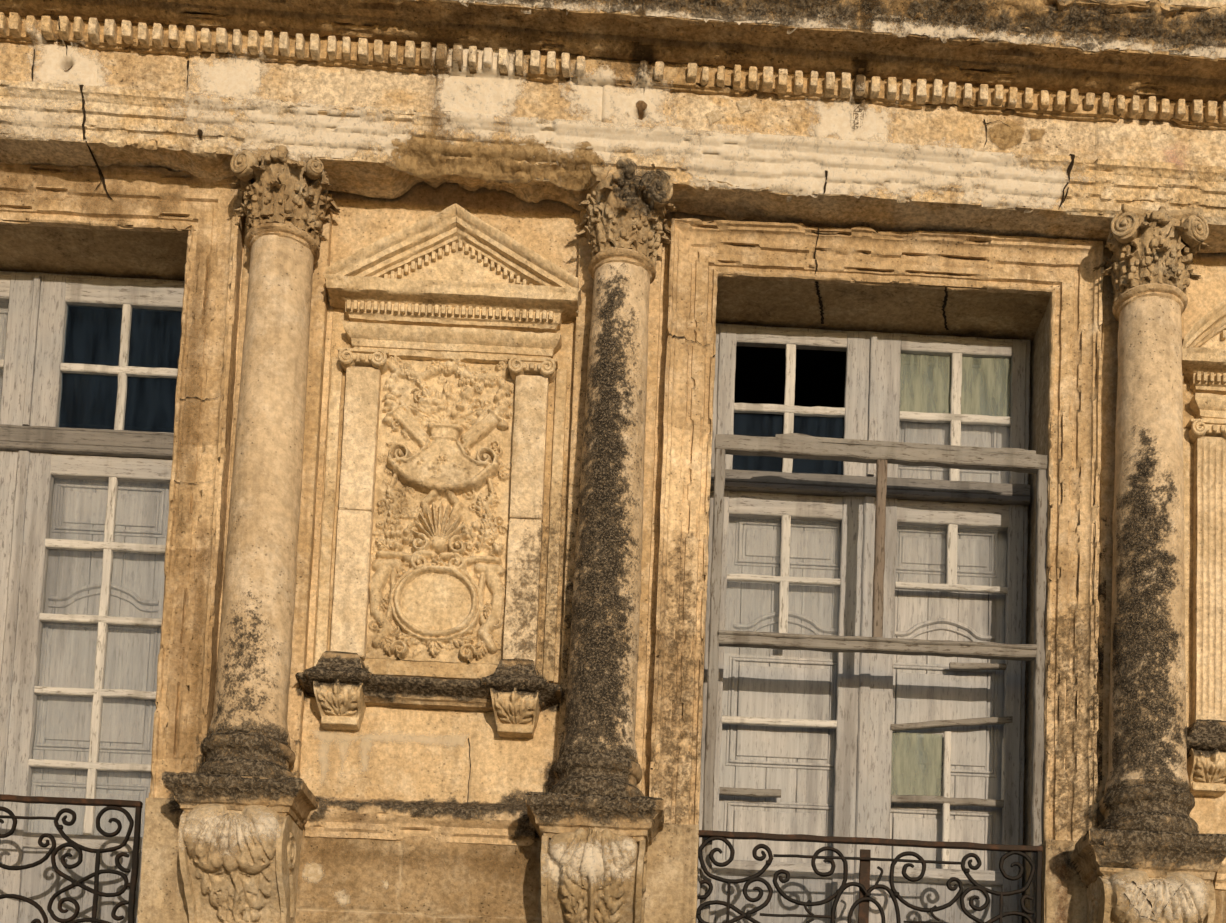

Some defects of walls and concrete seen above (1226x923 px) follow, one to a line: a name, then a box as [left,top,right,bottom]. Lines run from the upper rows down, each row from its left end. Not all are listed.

damp [451,0,1226,59]
crack [79,85,113,200]
crack [1059,154,1075,209]
crack [814,228,824,324]
crack [941,287,949,330]
damp [295,646,661,888]
damp [1062,548,1226,921]